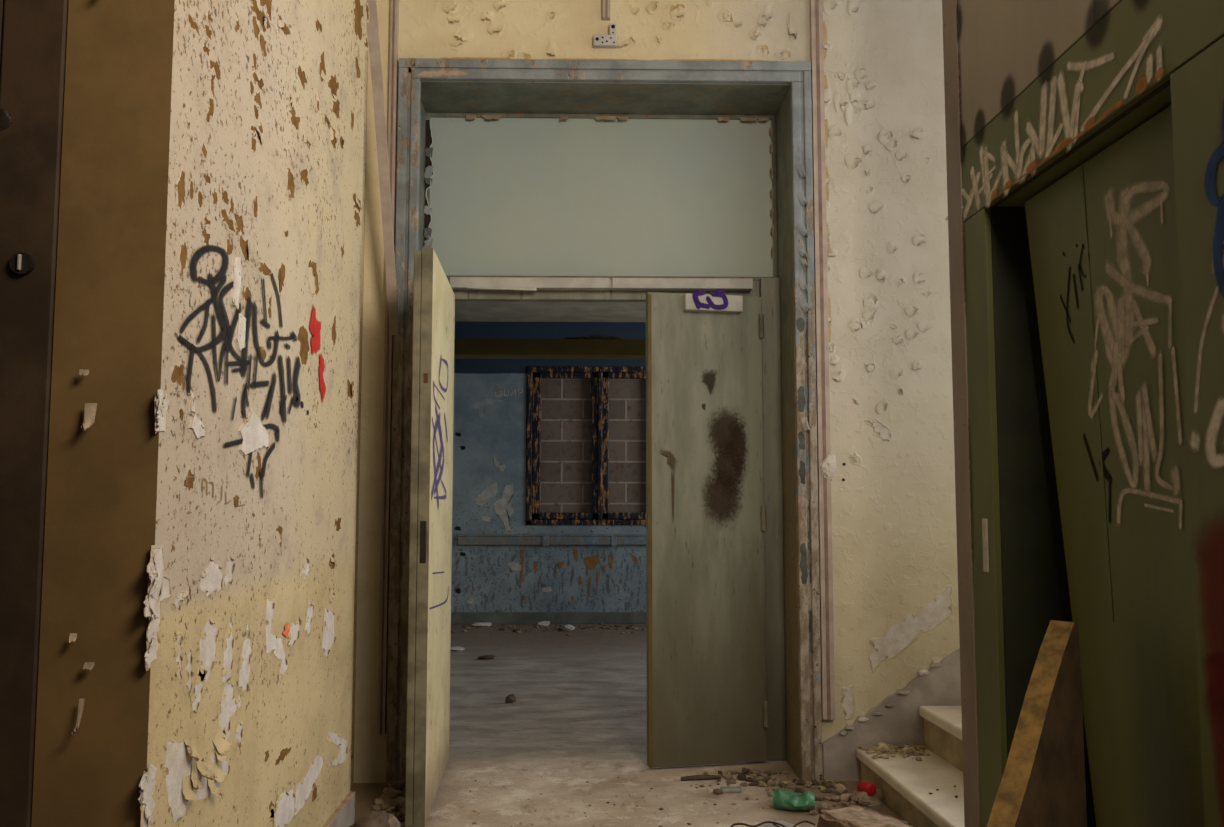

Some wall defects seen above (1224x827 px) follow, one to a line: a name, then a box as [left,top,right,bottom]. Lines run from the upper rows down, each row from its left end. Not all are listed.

peeling [349,0,369,83]
peeling [288,14,354,151]
peeling [175,0,291,368]
peeling [286,164,310,203]
peeling [352,191,362,231]
peeling [307,257,320,298]
peeling [81,403,97,431]
peeling [154,360,206,443]
flaking render [237,407,269,484]
peeling [346,377,354,402]
flaking render [138,515,348,827]
peeling [72,699,84,736]